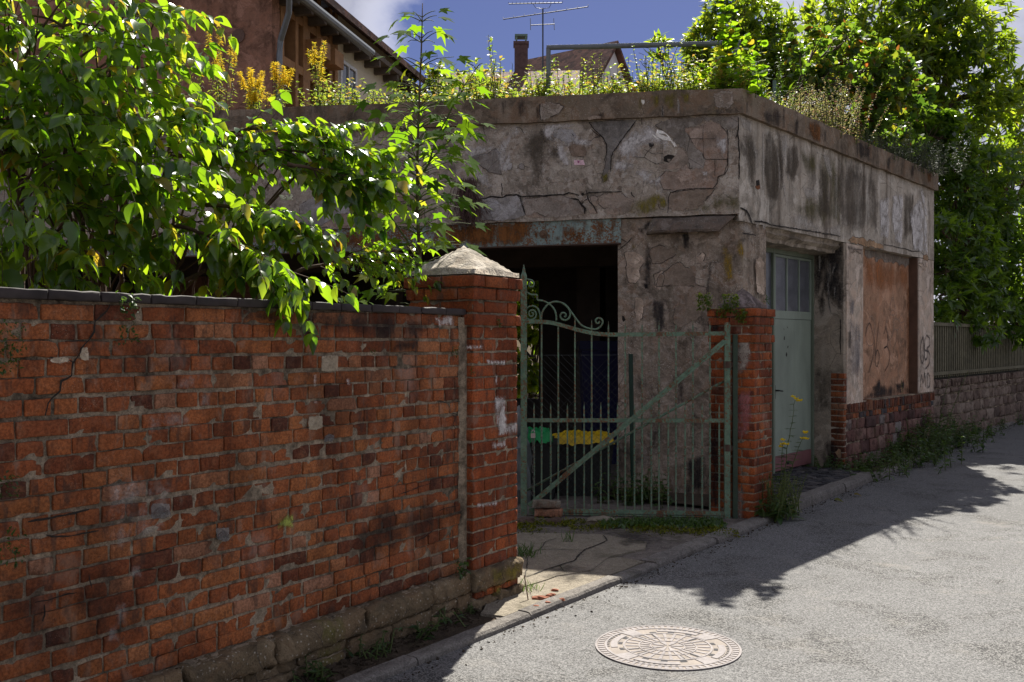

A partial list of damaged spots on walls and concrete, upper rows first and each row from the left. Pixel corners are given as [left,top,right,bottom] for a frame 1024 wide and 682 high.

rust [330,232,383,248]
rust [445,222,537,246]
crack [479,106,663,215]
crack [658,117,740,213]
leakage [741,110,928,311]